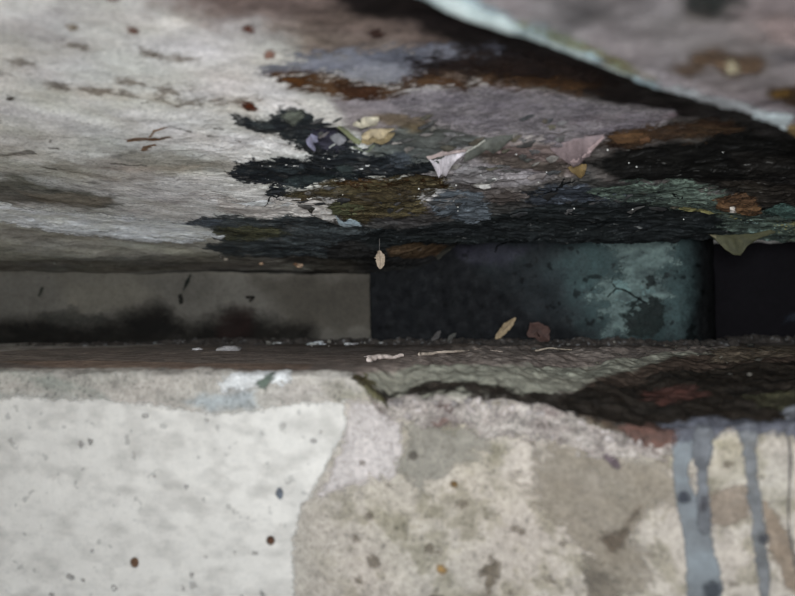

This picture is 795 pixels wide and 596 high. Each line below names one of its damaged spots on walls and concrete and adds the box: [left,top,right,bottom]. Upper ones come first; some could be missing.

rust [263,46,624,103]
peeling [297,191,326,214]
peeling [306,86,669,225]
water stain [0,305,315,344]
peeling [0,346,795,596]
water stain [532,405,795,596]